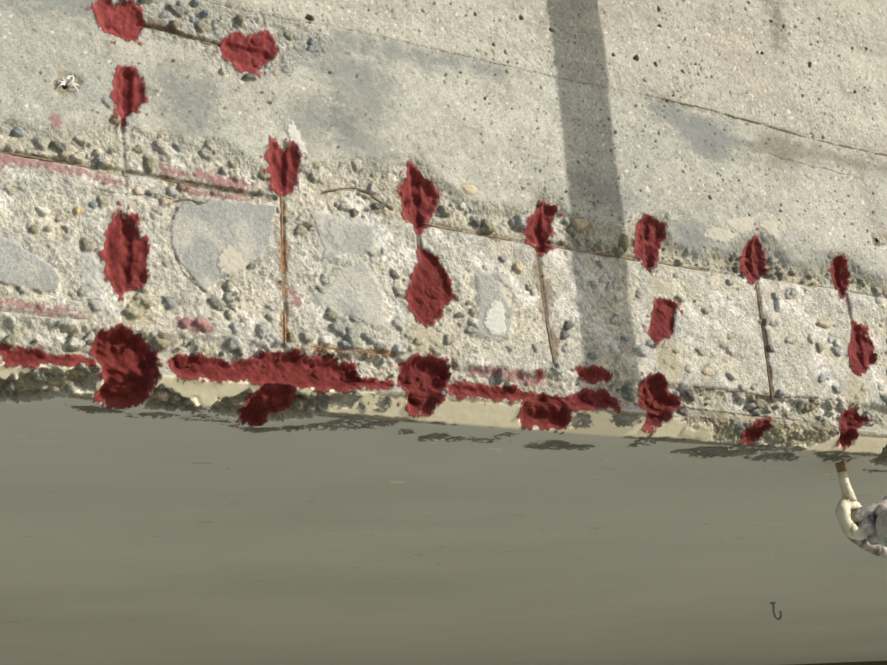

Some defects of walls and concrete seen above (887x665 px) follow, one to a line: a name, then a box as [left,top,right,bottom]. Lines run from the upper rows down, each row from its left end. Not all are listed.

crack [640,94,887,156]
rust [279,231,289,299]
spalling [0,116,887,473]
rust [315,346,396,357]